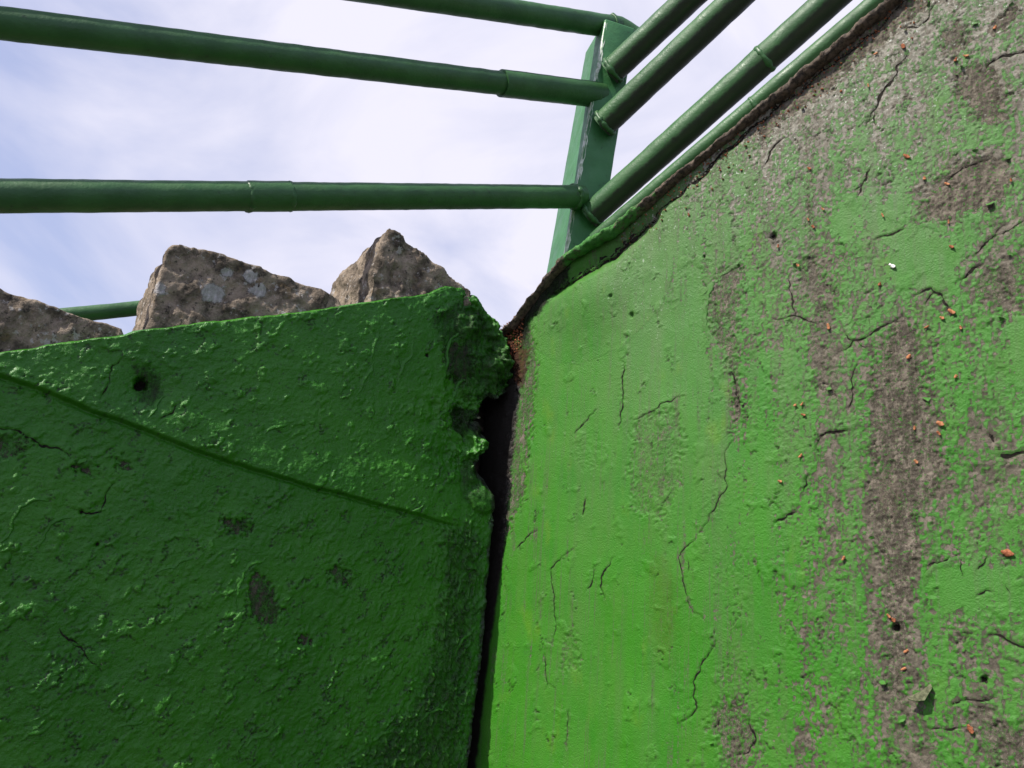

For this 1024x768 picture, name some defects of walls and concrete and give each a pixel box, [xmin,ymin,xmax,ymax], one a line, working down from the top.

peeling [752,0,931,141]
peeling [938,2,1018,126]
crack [986,51,1024,68]
peeling [915,149,1017,225]
crack [963,221,1023,279]
crack [777,276,814,323]
crack [917,287,951,317]
crack [817,317,900,444]
crack [678,444,730,615]
peeling [867,315,947,762]
crack [681,645,720,727]
peeling [705,701,763,768]